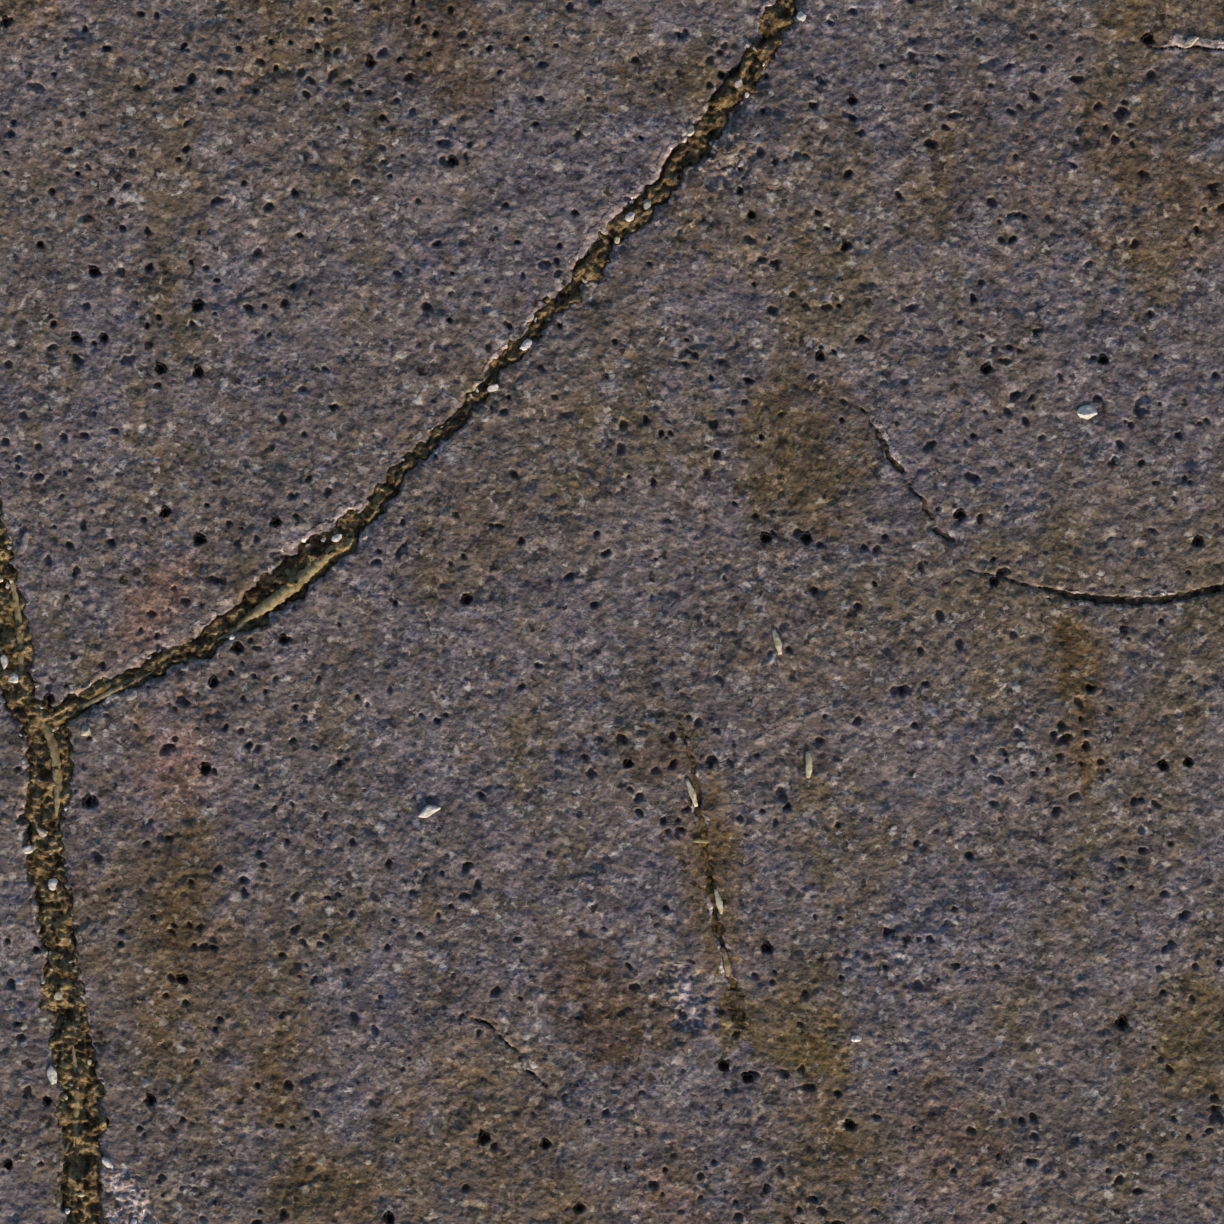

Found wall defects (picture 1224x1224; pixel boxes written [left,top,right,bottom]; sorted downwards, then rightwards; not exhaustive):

crack [1149,34,1224,58]
crack [861,407,955,542]
crack [0,0,797,1224]
crack [968,570,1224,610]